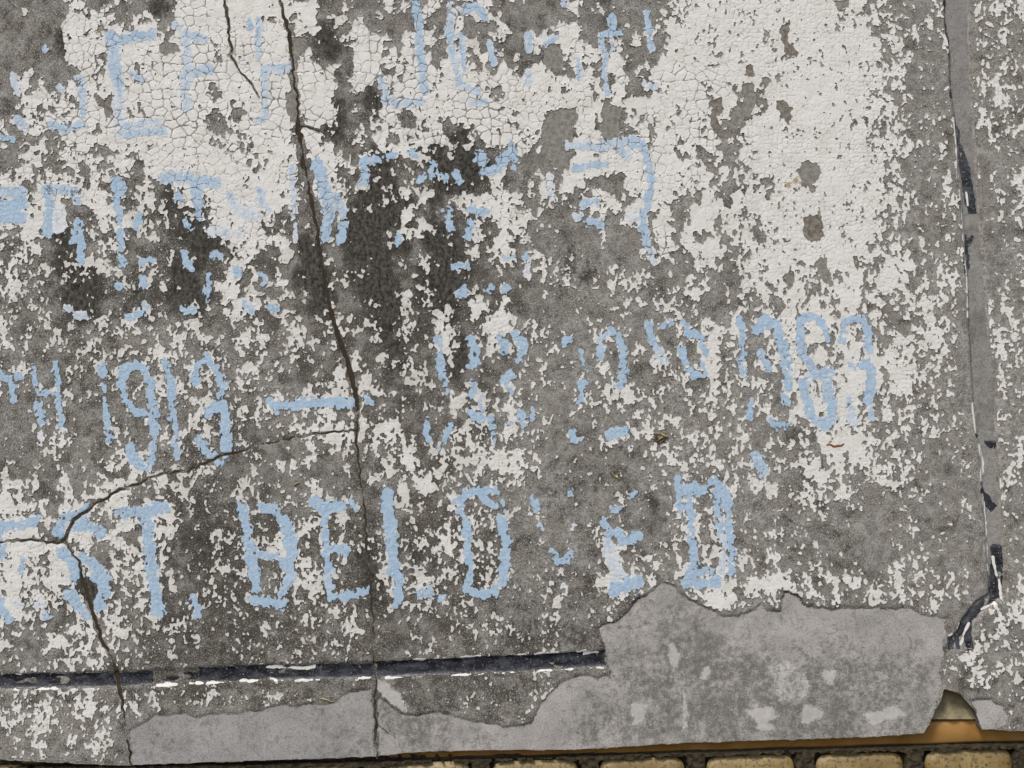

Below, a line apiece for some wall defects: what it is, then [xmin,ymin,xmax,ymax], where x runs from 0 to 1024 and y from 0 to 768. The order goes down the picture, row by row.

peeling [373,0,411,20]
peeling [972,0,1024,156]
peeling [925,160,963,242]
peeling [978,159,1024,230]
peeling [312,231,372,291]
crack [0,0,395,766]
peeling [586,317,631,354]
peeling [631,341,647,364]
peeling [988,235,1024,566]
spalling [0,463,1024,765]